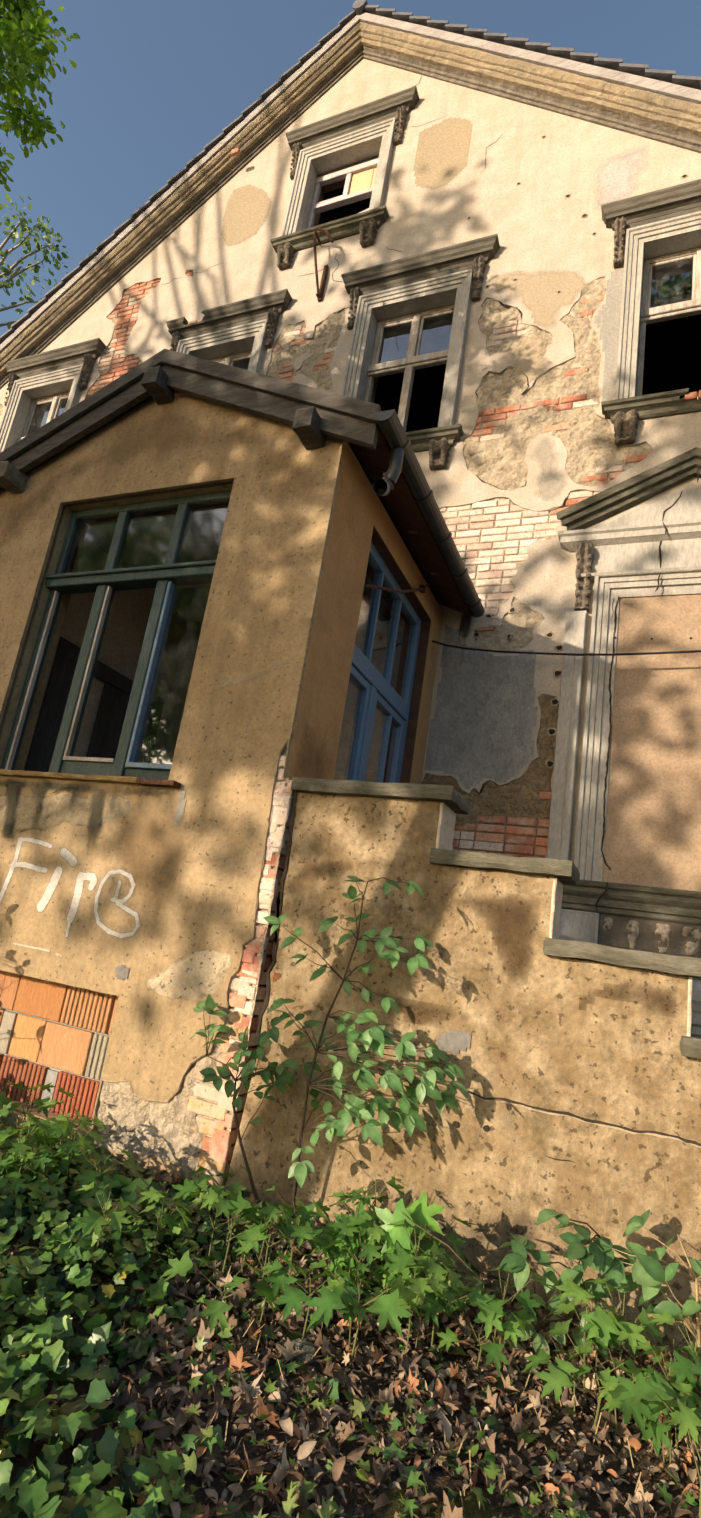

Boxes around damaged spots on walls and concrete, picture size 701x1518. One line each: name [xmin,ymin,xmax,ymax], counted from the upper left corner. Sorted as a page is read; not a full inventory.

spalling [86,278,161,398]
spalling [267,309,345,392]
spalling [422,276,652,858]
crack [595,467,701,913]
damp [0,779,102,842]
spalling [92,738,295,1186]
crack [436,1081,701,1148]